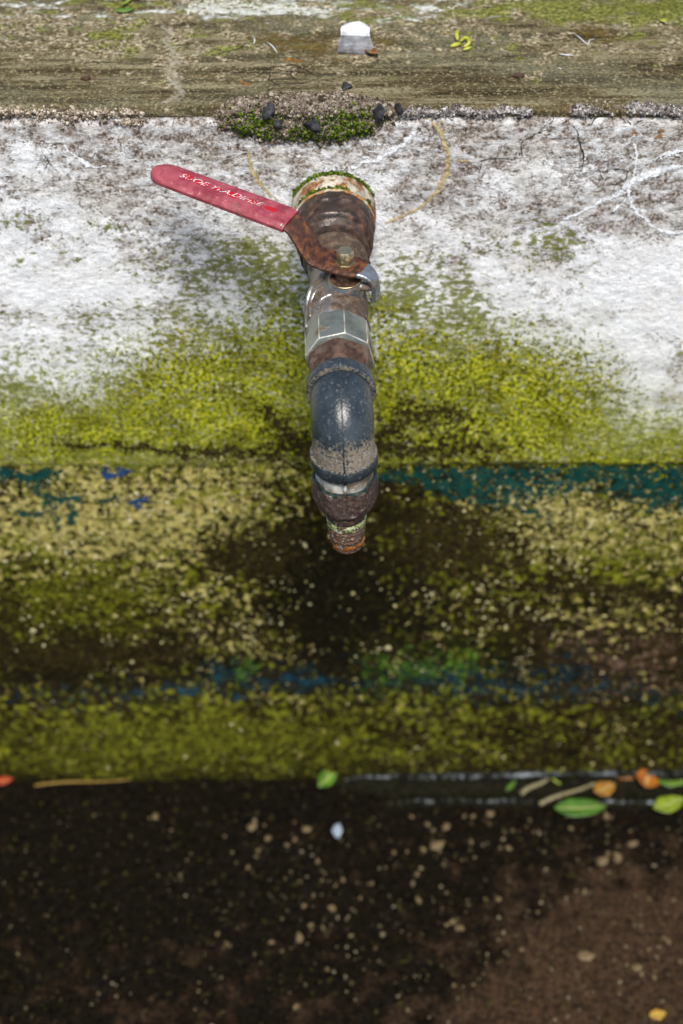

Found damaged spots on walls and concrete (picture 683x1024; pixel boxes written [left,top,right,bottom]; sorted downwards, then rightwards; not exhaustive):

leakage [282,131,415,248]
leakage [563,143,683,235]
leakage [192,396,683,747]